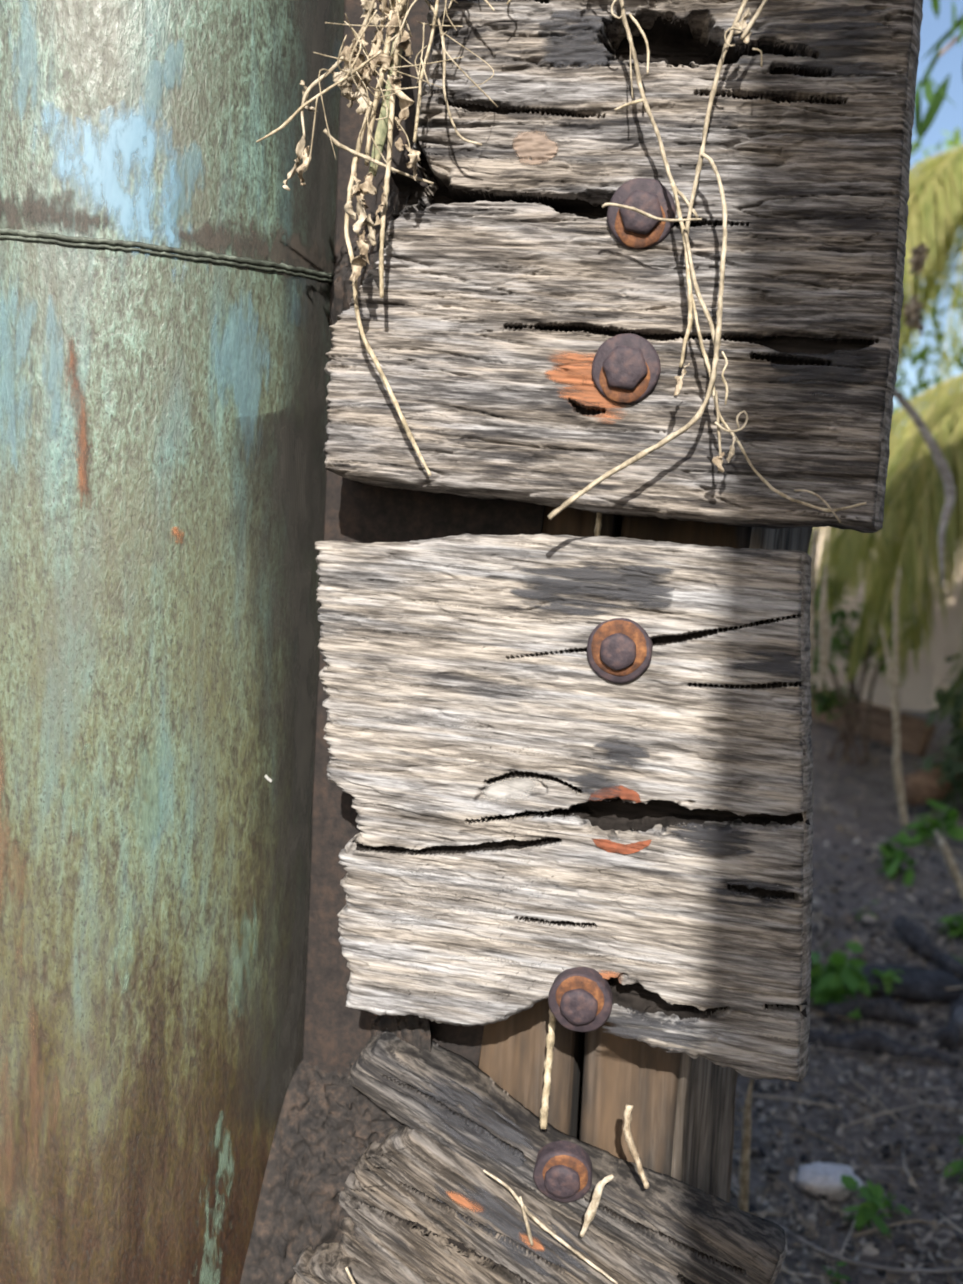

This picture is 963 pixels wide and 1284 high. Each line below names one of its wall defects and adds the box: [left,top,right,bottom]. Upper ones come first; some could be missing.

crack [697,67,846,105]
crack [508,324,876,366]
rust [545,352,650,418]
crack [651,615,800,646]
crack [511,648,587,659]
crack [690,681,802,689]
crack [488,771,581,793]
crack [356,837,560,856]